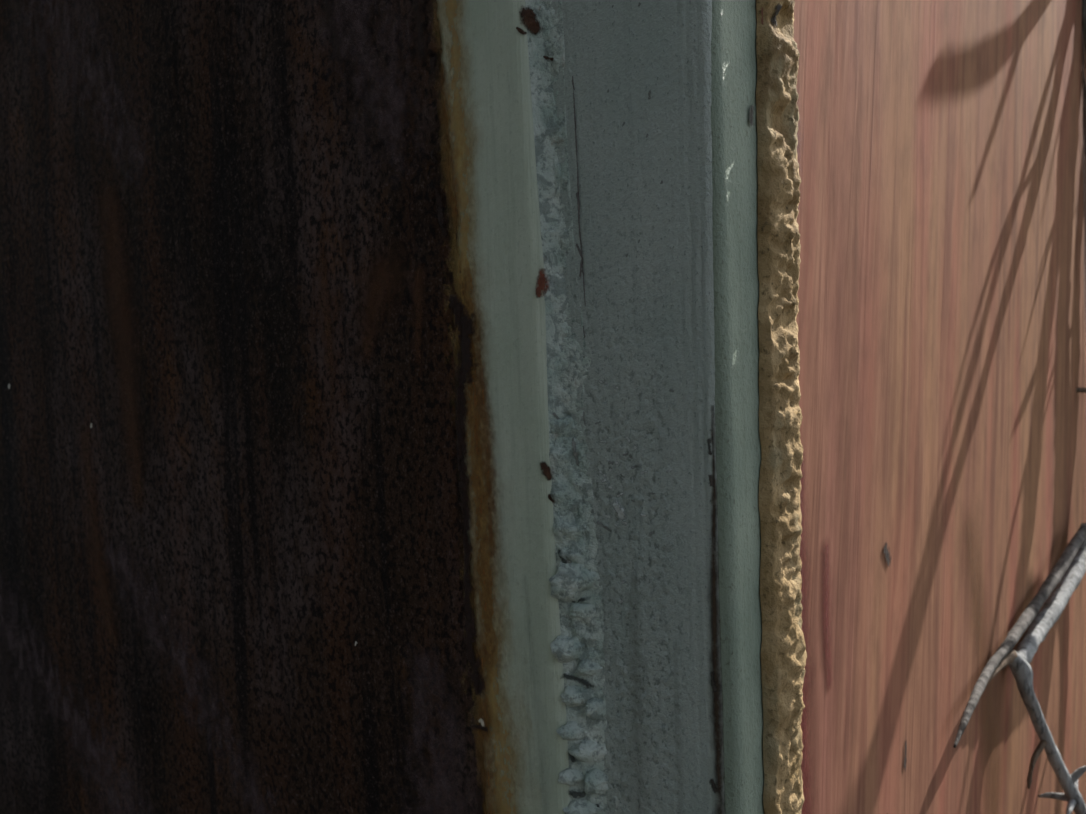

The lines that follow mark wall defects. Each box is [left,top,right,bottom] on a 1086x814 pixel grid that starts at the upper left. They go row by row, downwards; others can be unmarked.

corrosion [516,7,543,35]
corrosion [536,268,549,298]
corrosion [442,0,517,814]
corrosion [540,462,553,481]